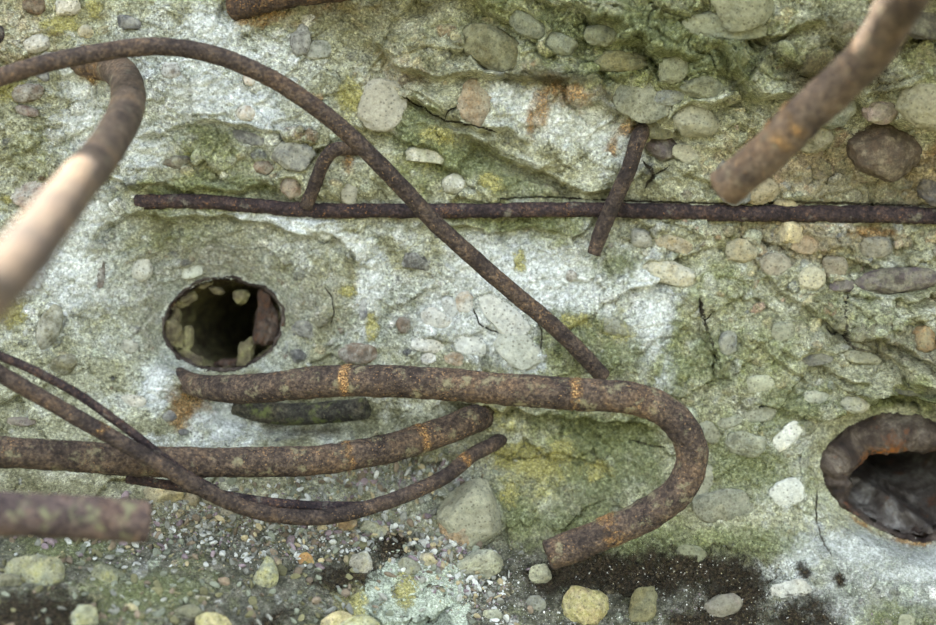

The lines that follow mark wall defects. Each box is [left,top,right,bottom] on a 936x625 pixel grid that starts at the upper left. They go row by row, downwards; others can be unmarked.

corrosion [337,364,355,398]
corrosion [171,392,207,429]
corrosion [896,526,932,546]